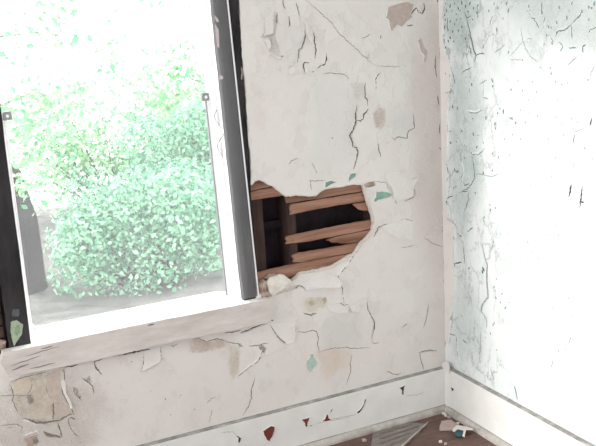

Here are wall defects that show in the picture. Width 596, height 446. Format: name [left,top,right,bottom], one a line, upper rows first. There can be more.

crack [276,0,397,170]
peeling [385,1,414,32]
crack [467,80,488,114]
crack [407,0,596,104]
spalling [251,172,418,294]
crack [336,250,357,306]
damp [408,0,489,374]
crack [439,122,501,209]
crack [1,344,177,443]
crack [194,320,285,415]
crack [295,304,379,384]